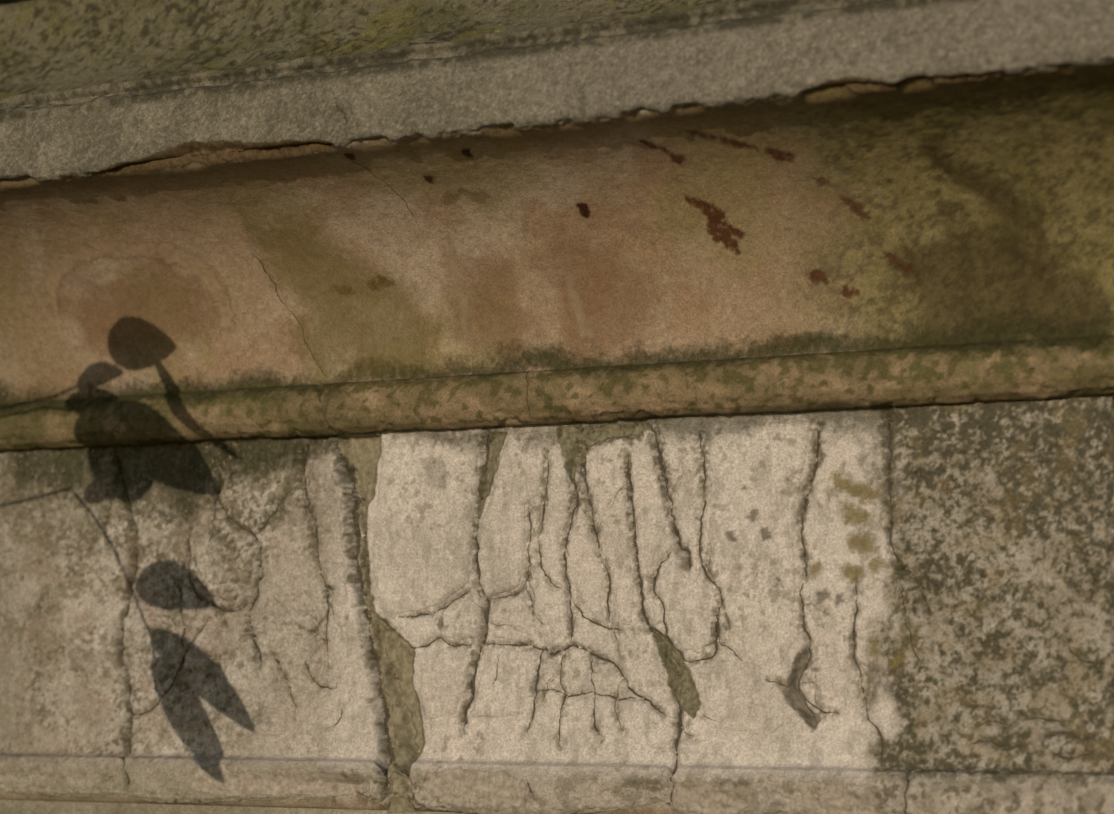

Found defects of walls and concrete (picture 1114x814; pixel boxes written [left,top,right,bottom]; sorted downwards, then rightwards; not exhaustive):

spalling [90,140,335,177]
corrosion [688,131,793,161]
corrosion [576,203,590,218]
corrosion [685,197,744,254]
corrosion [811,270,828,283]
crack [103,254,742,802]
crack [888,411,931,667]
crack [766,428,833,717]
spalling [336,431,526,814]
crack [853,584,923,814]
crack [970,717,1098,773]
spalling [191,764,369,797]